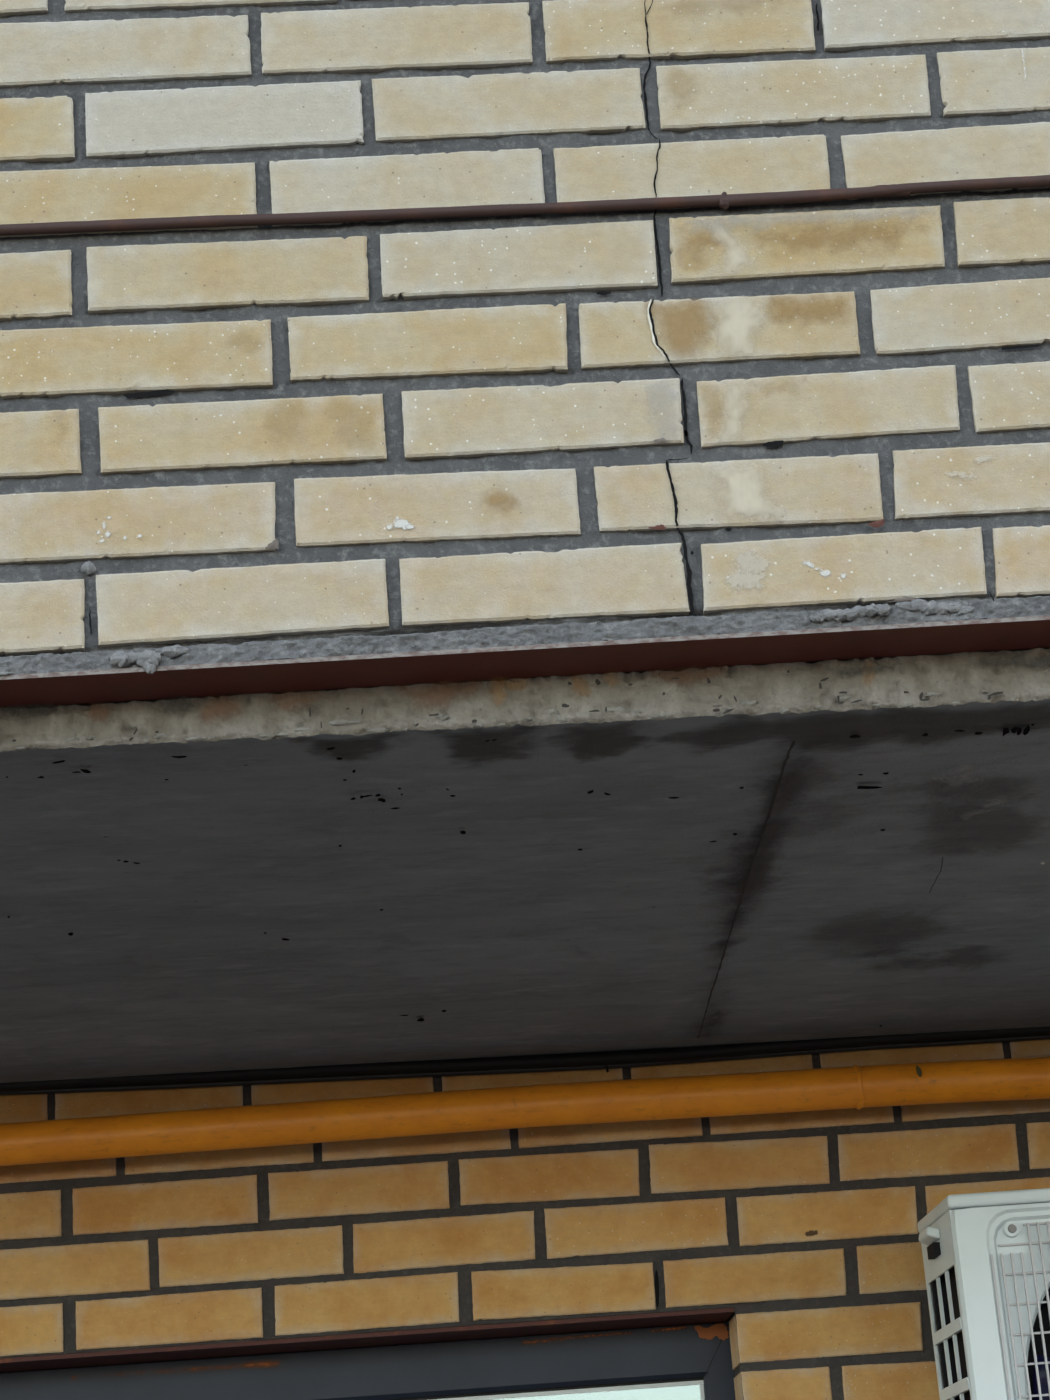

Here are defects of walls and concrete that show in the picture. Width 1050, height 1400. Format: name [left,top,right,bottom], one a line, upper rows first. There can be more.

crack [643,0,697,616]
damp [298,736,385,759]
damp [449,726,534,761]
damp [560,727,644,759]
damp [675,708,1050,747]
crack [697,740,802,1038]